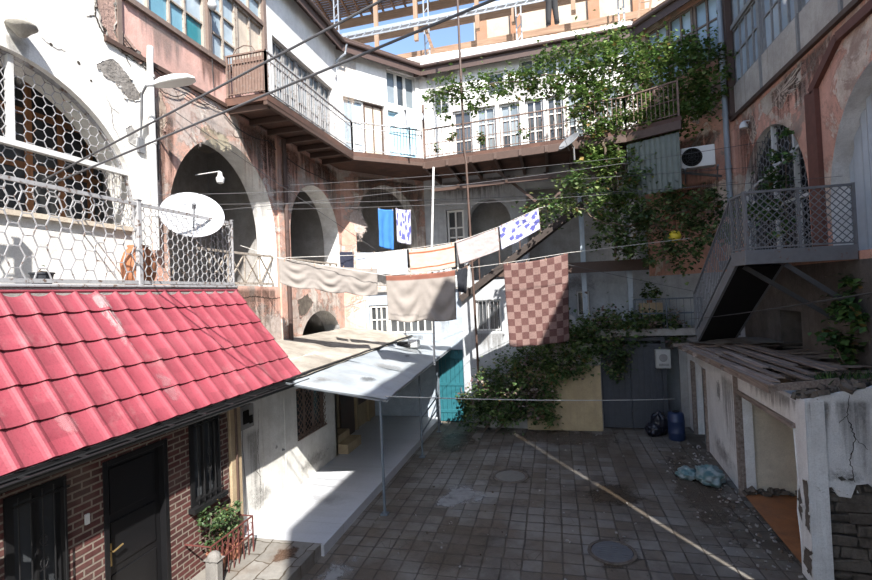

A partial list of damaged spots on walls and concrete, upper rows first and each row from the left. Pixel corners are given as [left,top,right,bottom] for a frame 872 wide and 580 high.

peeling [94,0,155,102]
crack [839,395,868,482]
water stain [588,484,644,507]
flaking render [797,475,872,580]